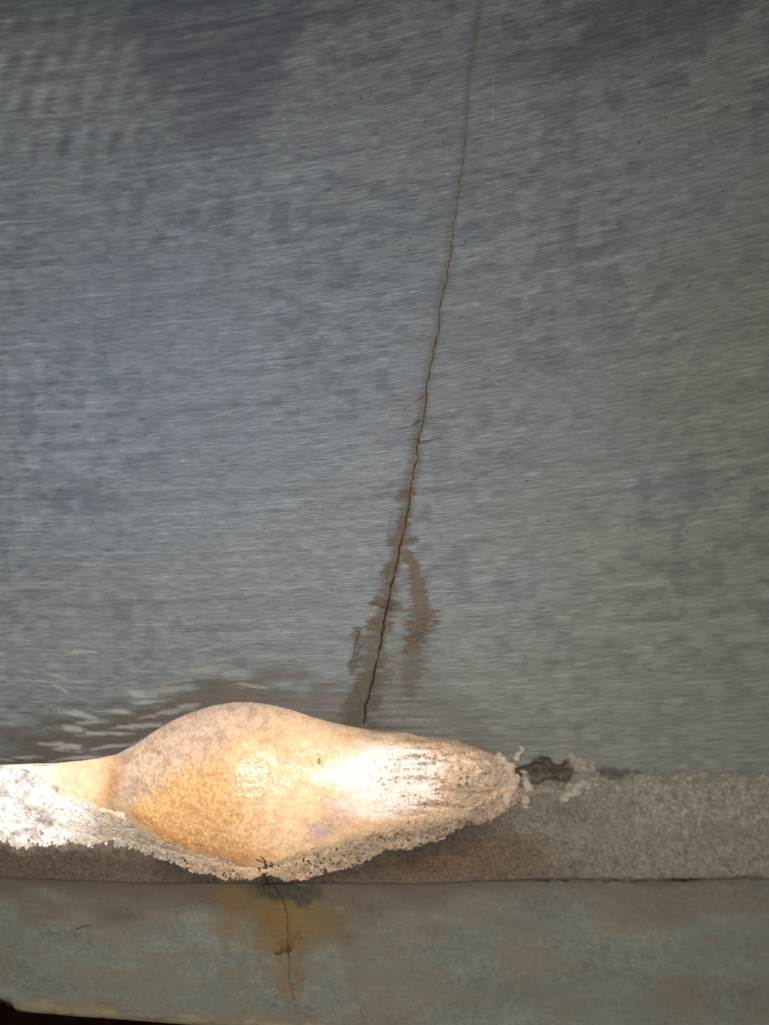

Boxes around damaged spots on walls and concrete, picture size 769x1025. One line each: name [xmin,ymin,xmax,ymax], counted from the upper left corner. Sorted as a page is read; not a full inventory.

crack [356,161,463,724]
peeling [39,644,267,759]
damp [379,679,472,745]